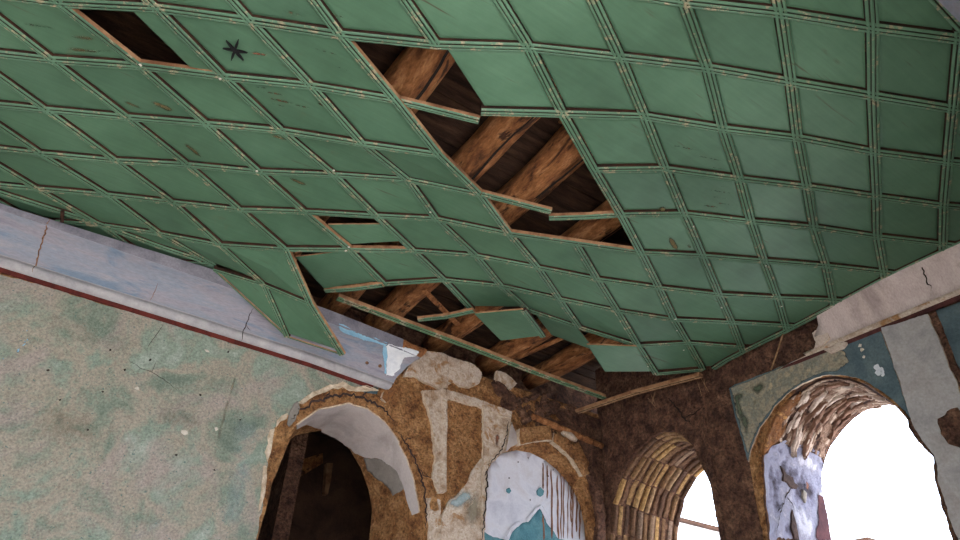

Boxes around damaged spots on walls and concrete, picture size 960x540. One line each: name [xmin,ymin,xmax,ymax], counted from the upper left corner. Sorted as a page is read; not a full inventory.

crack [32,219,50,272]
flaking render [256,316,960,540]